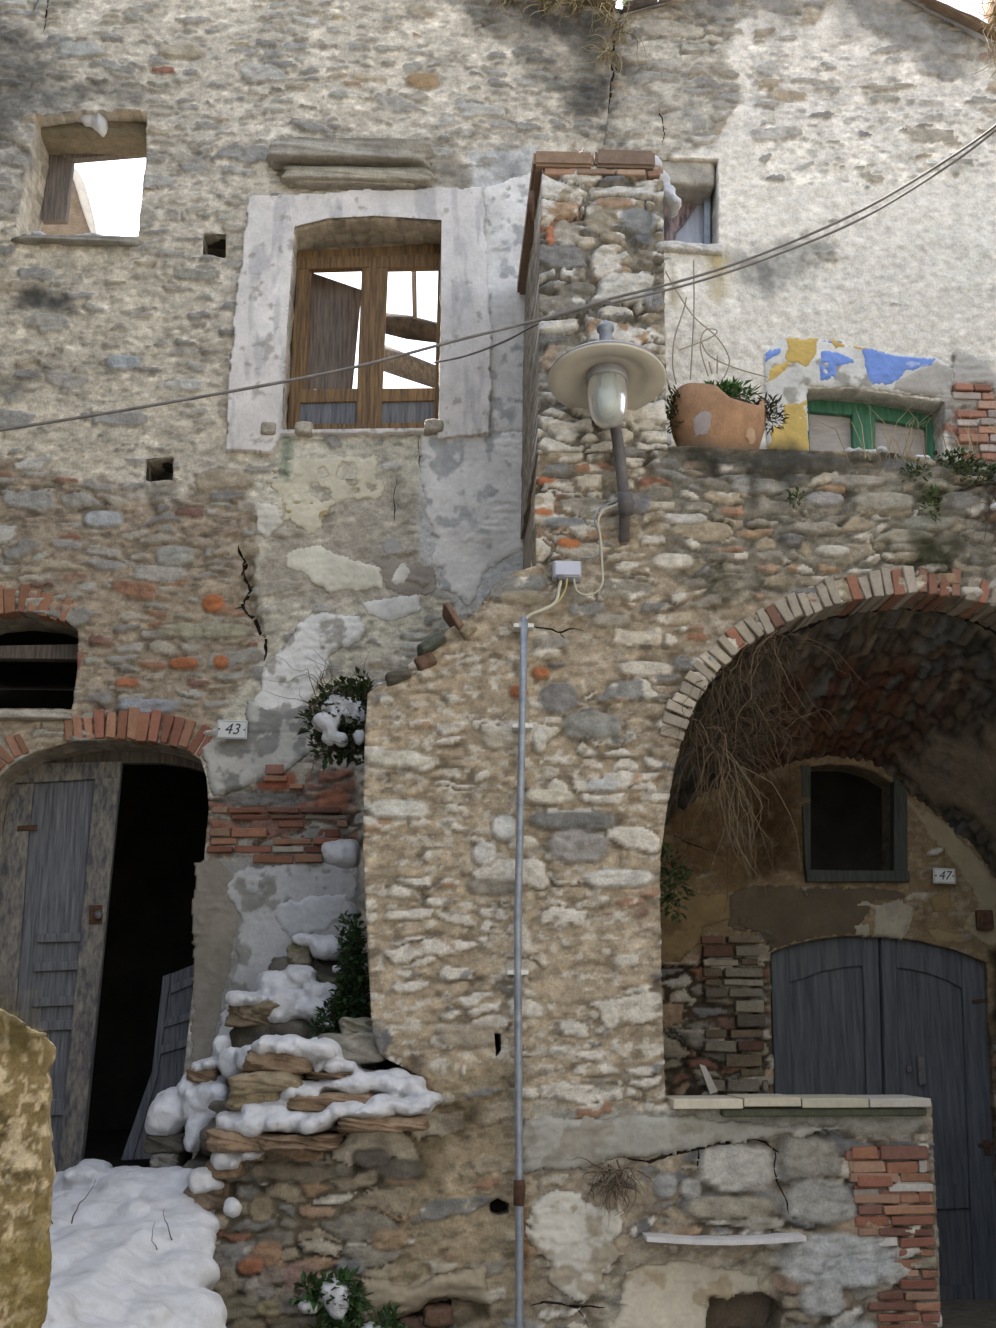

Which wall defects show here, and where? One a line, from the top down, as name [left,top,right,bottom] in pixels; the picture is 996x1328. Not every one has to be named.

peeling [763,337,996,461]
crack [235,545,268,661]
peeling [190,172,531,1063]